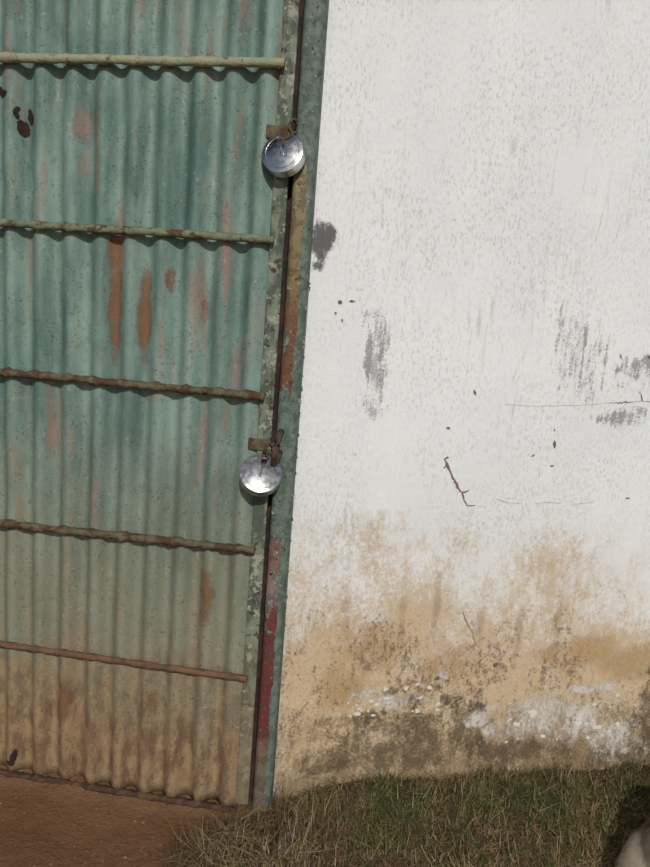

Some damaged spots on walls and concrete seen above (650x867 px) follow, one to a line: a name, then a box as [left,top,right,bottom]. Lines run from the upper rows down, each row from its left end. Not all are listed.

rust [108,234,122,346]
rust [138,274,151,346]
damp [312,221,336,270]
damp [555,307,608,400]
crack [506,393,650,410]
damp [302,687,541,779]
damp [585,671,650,768]